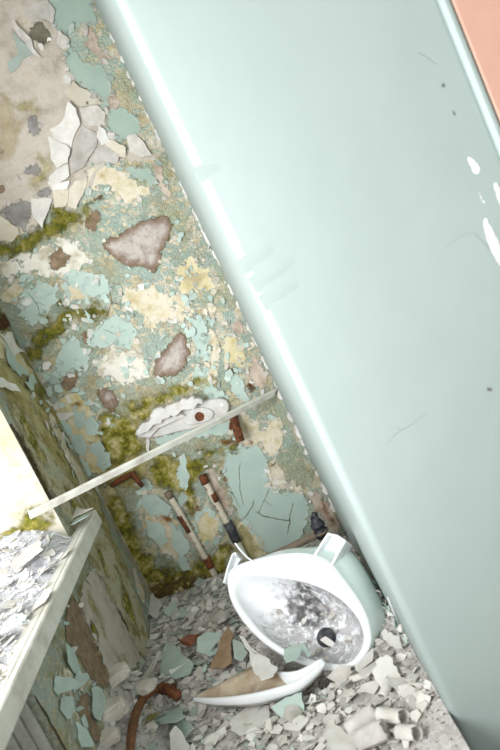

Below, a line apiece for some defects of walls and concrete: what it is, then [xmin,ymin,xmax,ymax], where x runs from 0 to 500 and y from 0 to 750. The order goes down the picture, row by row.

peeling [0,0,175,243]
peeling [467,157,480,174]
peeling [483,218,500,265]
water stain [0,340,149,568]
flaking render [53,566,162,747]
peeling [0,181,340,572]
water stain [148,574,207,599]
crack [228,466,293,534]